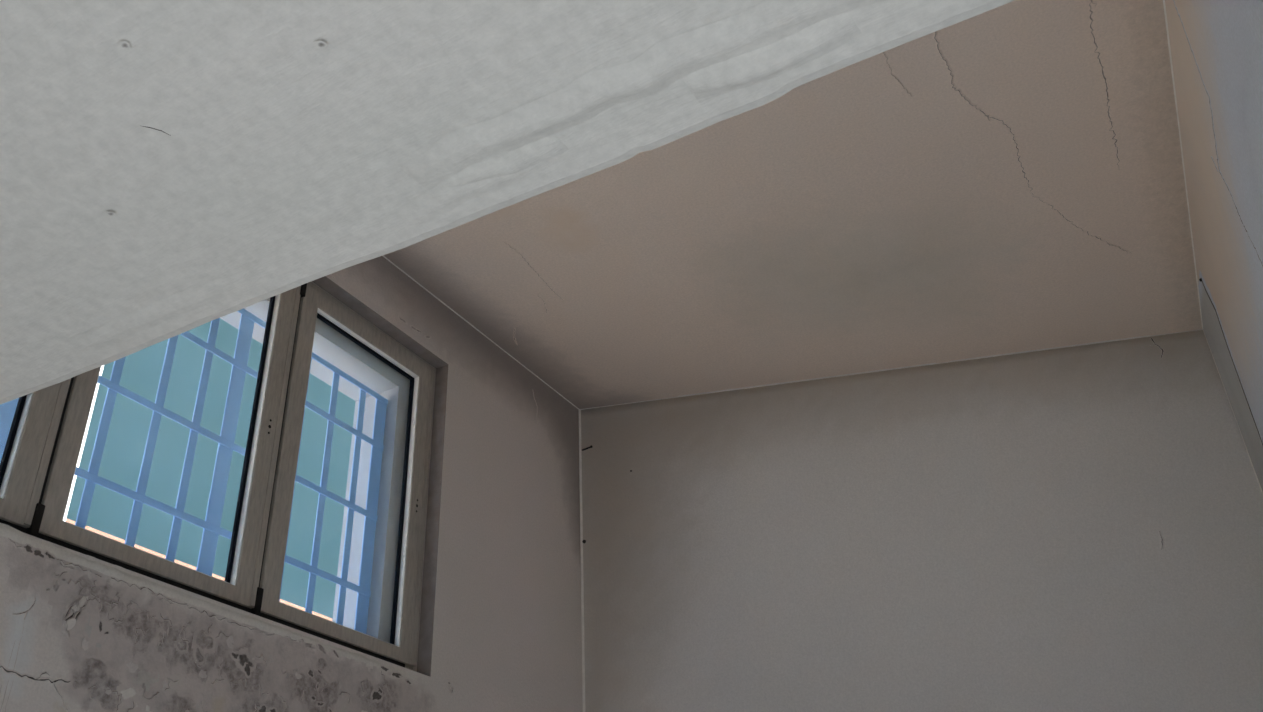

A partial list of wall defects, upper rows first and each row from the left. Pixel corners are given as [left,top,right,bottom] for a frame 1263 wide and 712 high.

crack [932,31,1131,253]
crack [1088,0,1120,170]
damp [0,579,53,712]
crack [0,665,81,712]